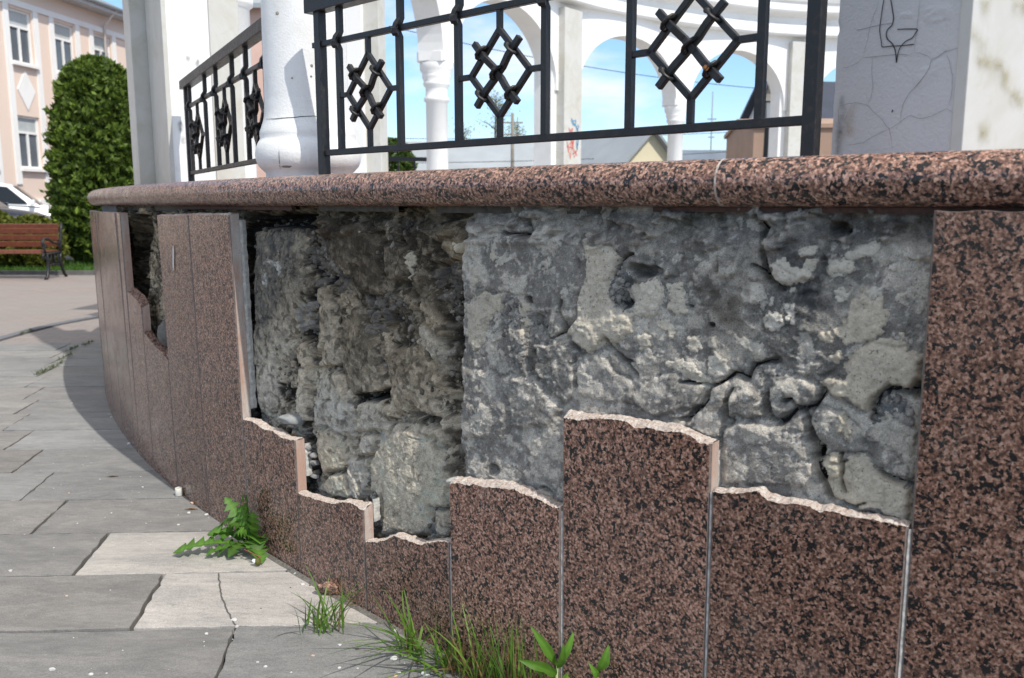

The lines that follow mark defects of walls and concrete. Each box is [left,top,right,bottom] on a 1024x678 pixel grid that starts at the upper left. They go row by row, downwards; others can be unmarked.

crack [838,1,956,145]
peeling [403,250,417,280]
peeling [431,237,556,378]
peeling [568,244,734,389]
peeling [735,240,926,440]
spalling [243,417,304,441]
spalling [564,409,717,445]
spalling [298,464,372,510]
spalling [450,476,563,508]
peeling [712,451,915,527]
spalling [366,532,451,545]
crack [218,573,236,625]